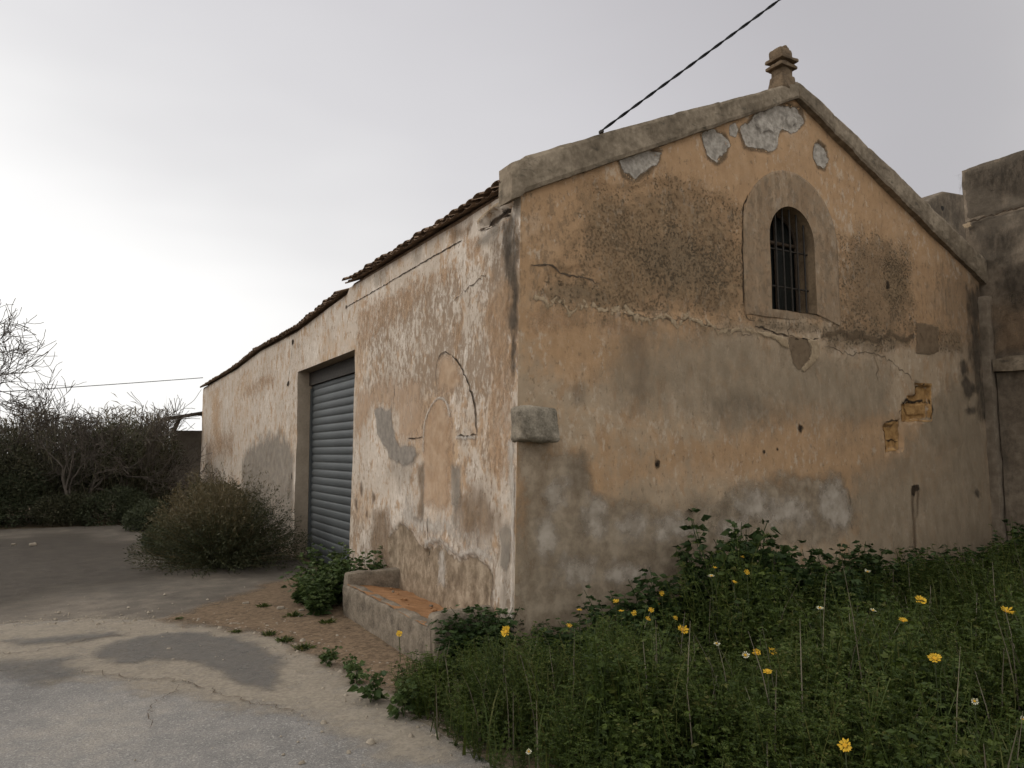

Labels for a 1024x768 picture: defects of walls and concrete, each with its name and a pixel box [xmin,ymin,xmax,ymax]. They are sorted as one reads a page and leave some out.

flaking render [700,103,805,165]
flaking render [813,140,829,171]
water stain [503,215,518,370]
spalling [533,149,917,372]
spalling [882,383,933,452]
water stain [508,441,853,657]